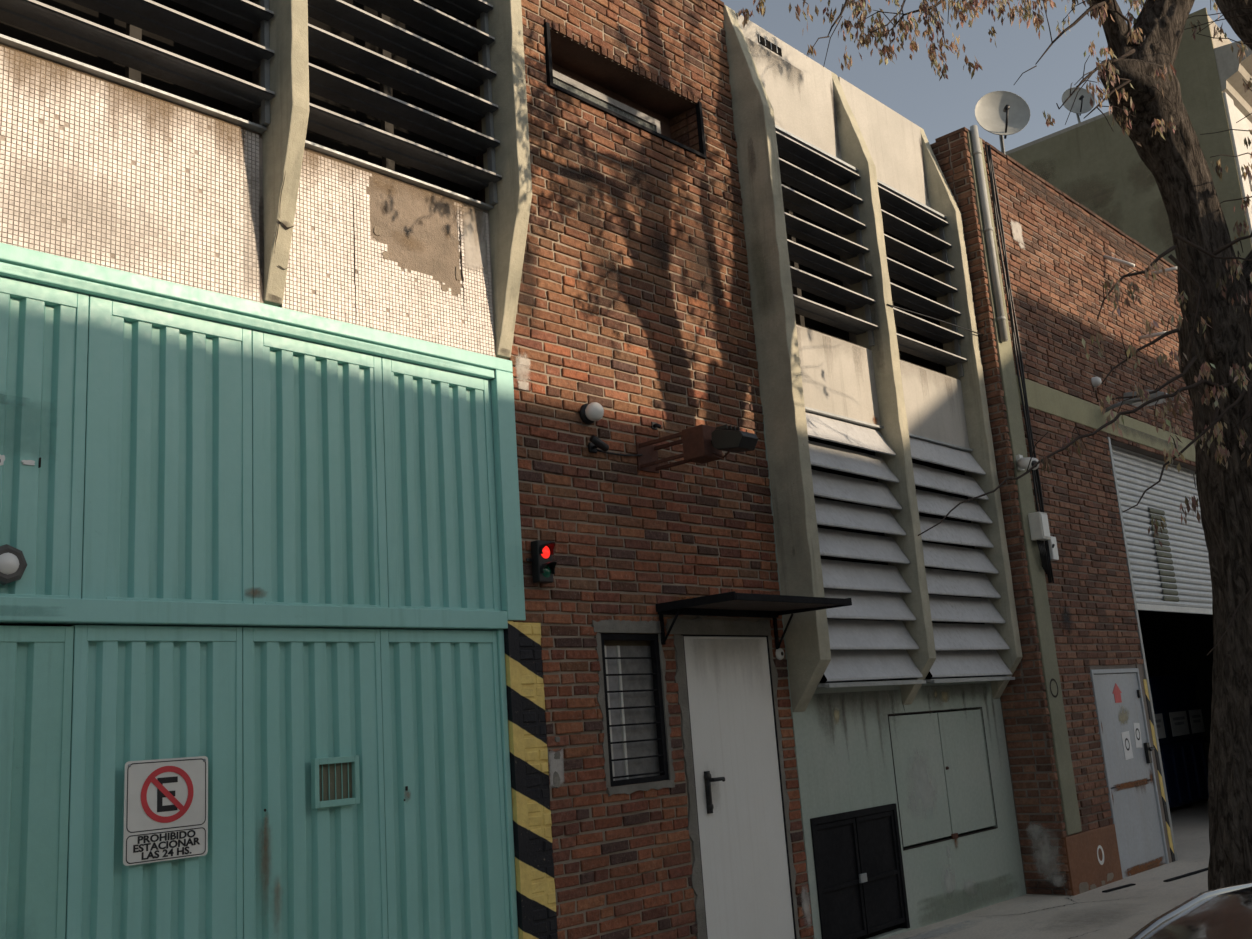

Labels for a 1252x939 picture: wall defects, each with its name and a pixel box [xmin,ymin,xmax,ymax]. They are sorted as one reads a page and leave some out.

spalling [367,172,487,296]
water stain [1027,824,1063,886]